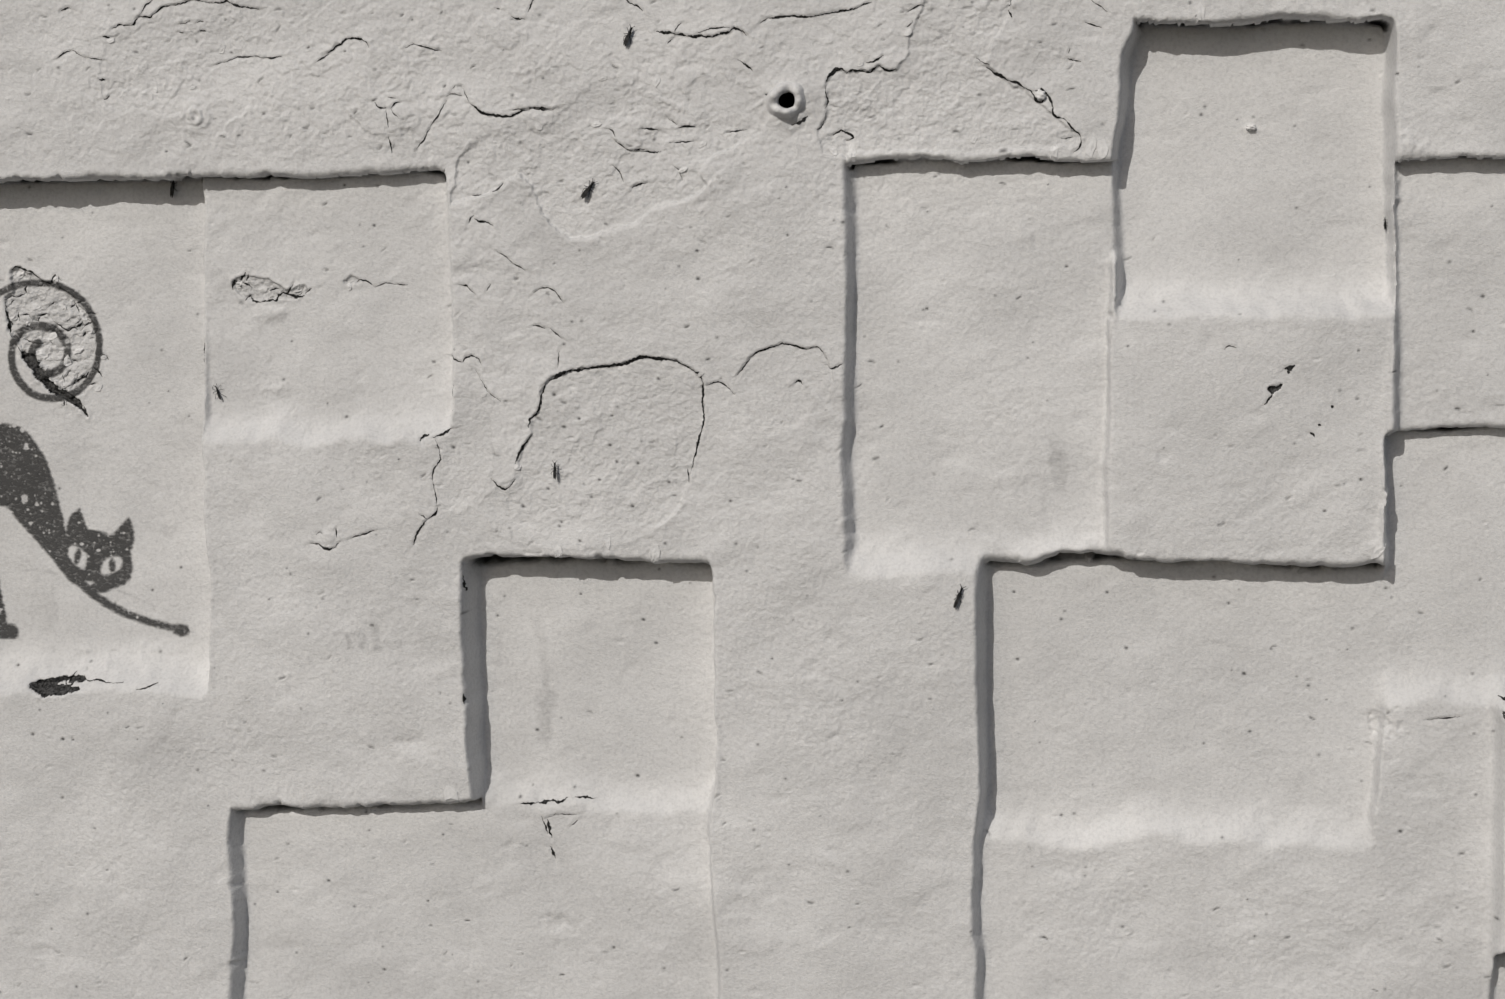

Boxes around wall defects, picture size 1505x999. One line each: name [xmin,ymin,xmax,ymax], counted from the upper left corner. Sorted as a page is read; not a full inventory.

crack [59,0,282,100]
crack [318,37,368,61]
crack [627,0,871,96]
crack [375,85,549,151]
crack [610,119,742,188]
crack [977,58,1082,151]
flaking render [232,272,312,303]
crack [463,185,561,369]
flaking render [5,266,109,417]
crack [709,342,842,393]
crack [413,355,500,545]
crack [313,530,374,551]